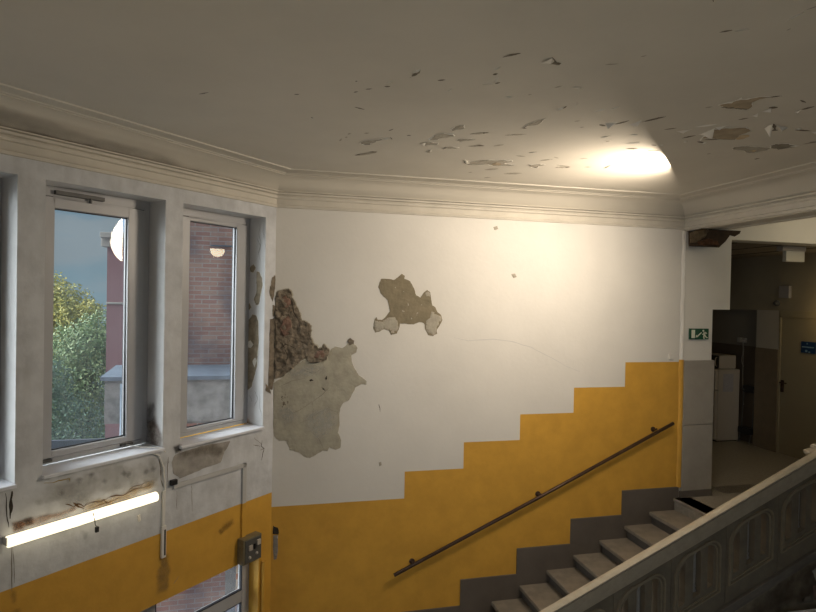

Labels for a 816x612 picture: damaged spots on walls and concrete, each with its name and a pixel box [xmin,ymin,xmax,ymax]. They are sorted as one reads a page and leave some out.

peeling [422,125,489,153]
peeling [464,152,570,178]
peeling [664,96,816,159]
peeling [373,274,443,336]
peeling [248,229,367,458]